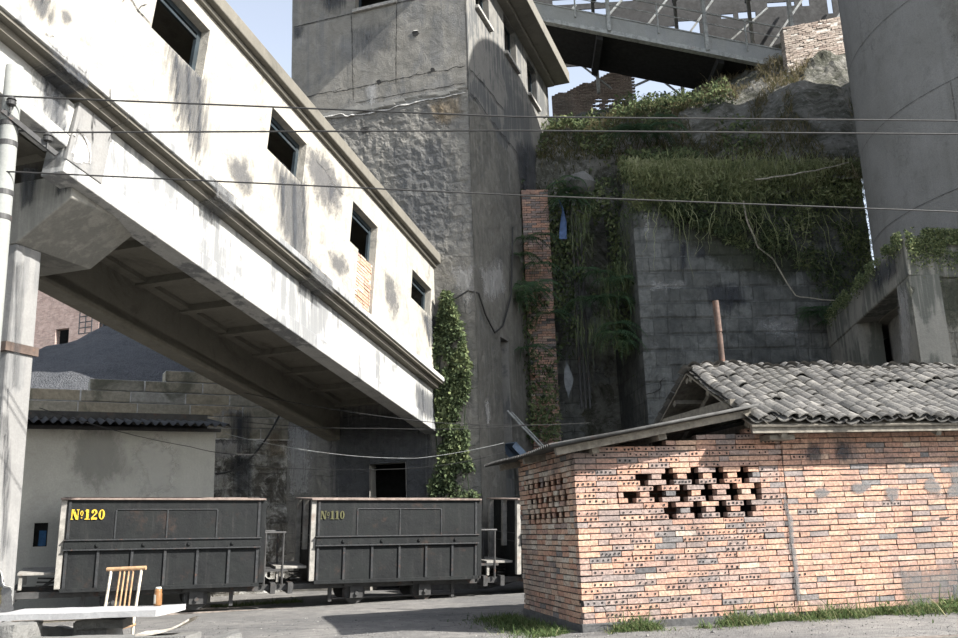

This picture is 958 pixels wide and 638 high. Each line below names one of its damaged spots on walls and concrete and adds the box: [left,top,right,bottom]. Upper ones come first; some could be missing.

water stain [171,52,206,156]
water stain [231,160,250,189]
water stain [278,151,342,254]
water stain [333,256,349,274]
peeling [0,570,14,613]